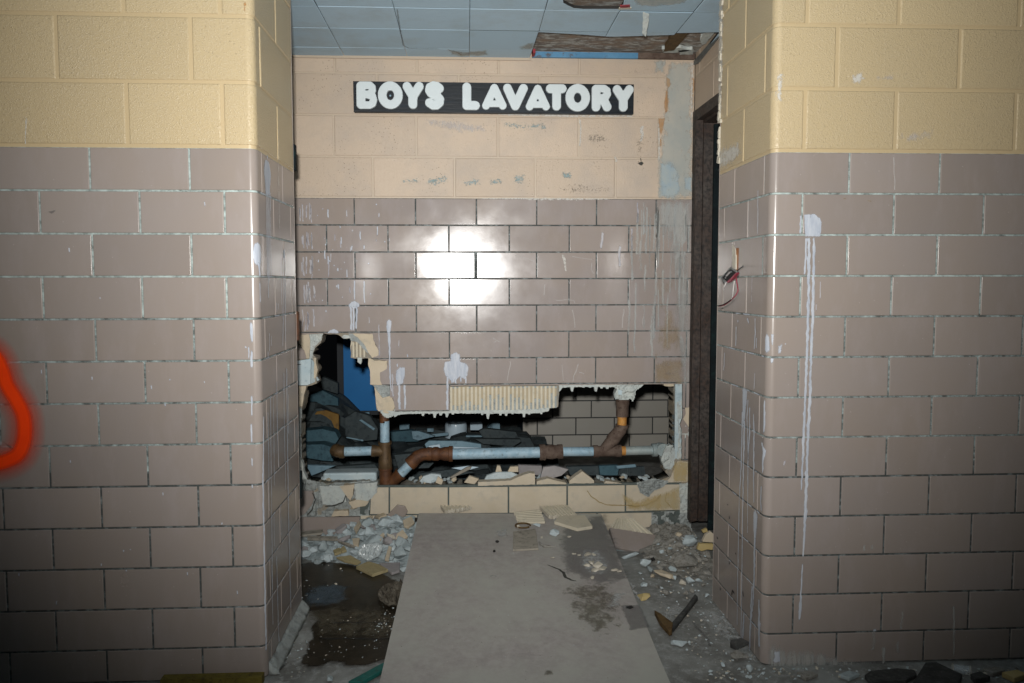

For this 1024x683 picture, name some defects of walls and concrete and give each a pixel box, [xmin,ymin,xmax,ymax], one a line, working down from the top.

spalling [342,333,613,419]
spalling [298,333,387,556]
spalling [478,470,622,486]
spalling [637,460,692,530]
leakage [301,562,398,666]